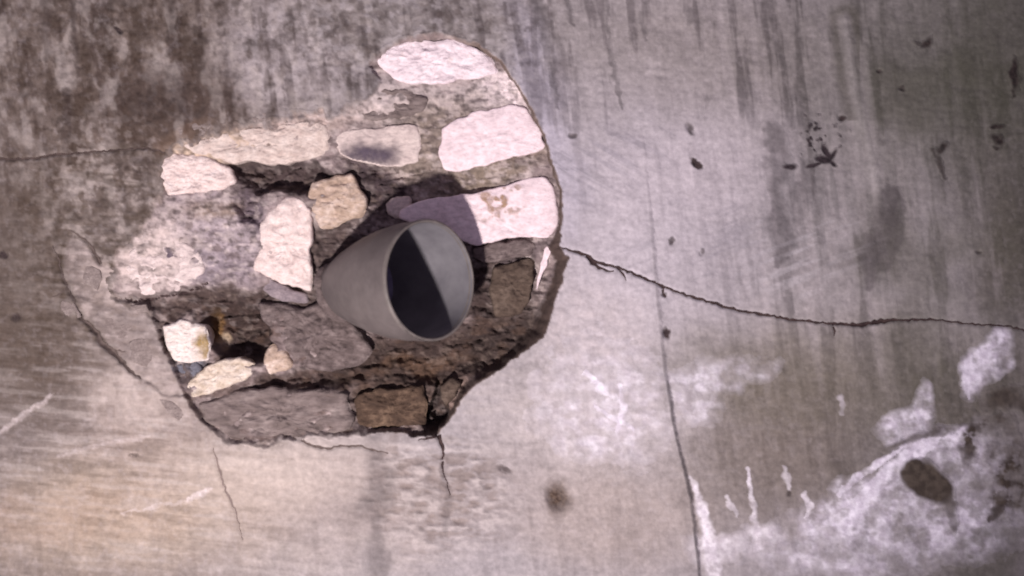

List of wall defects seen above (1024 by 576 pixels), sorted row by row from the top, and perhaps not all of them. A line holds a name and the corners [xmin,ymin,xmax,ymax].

crack [0,147,165,161]
flaking render [61,30,571,451]
crack [554,246,1024,335]
crack [418,434,450,494]
water stain [679,323,1024,576]